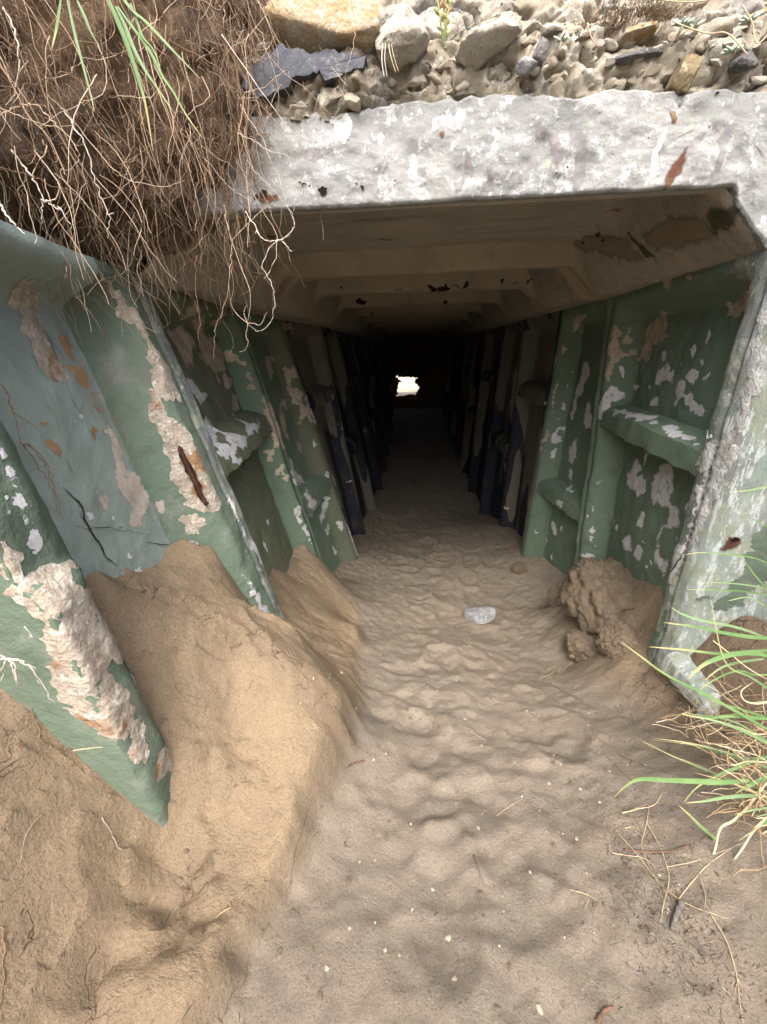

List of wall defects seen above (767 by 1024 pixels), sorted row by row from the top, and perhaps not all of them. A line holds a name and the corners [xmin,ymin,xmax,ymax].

spalling [8,278,90,388]
hole [427,281,469,304]
peeling [40,421,62,457]
crack [65,460,168,566]
peeling [78,414,165,527]
spalling [98,269,358,569]
spalling [539,306,767,584]
spalling [0,448,173,792]
peeling [243,575,269,613]